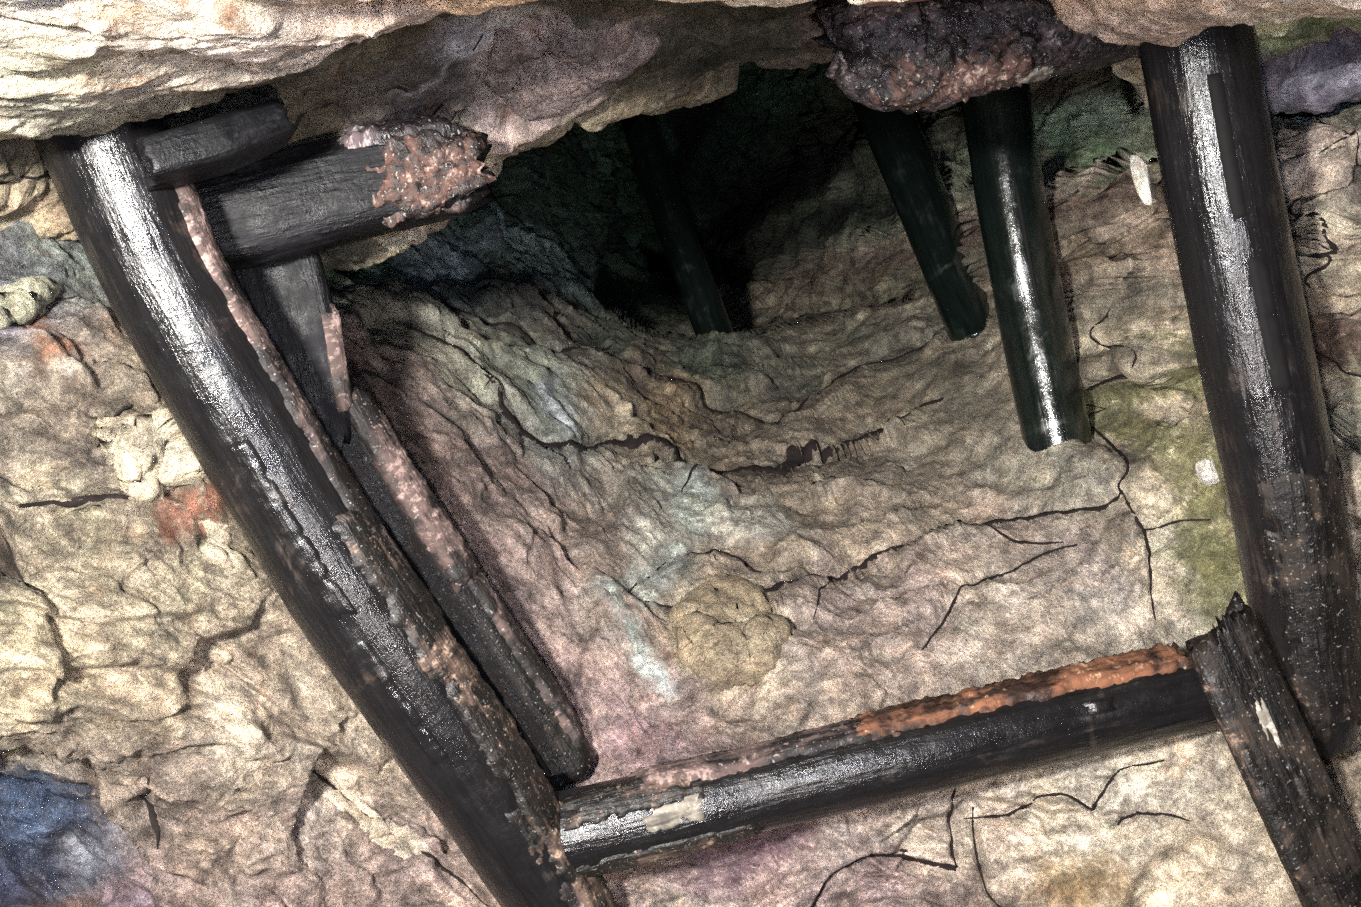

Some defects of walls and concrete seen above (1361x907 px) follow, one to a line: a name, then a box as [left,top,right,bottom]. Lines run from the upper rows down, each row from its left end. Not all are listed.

crack [406,298,945,492]
crack [922,309,1213,651]
crack [622,545,904,619]
crack [811,759,1190,907]